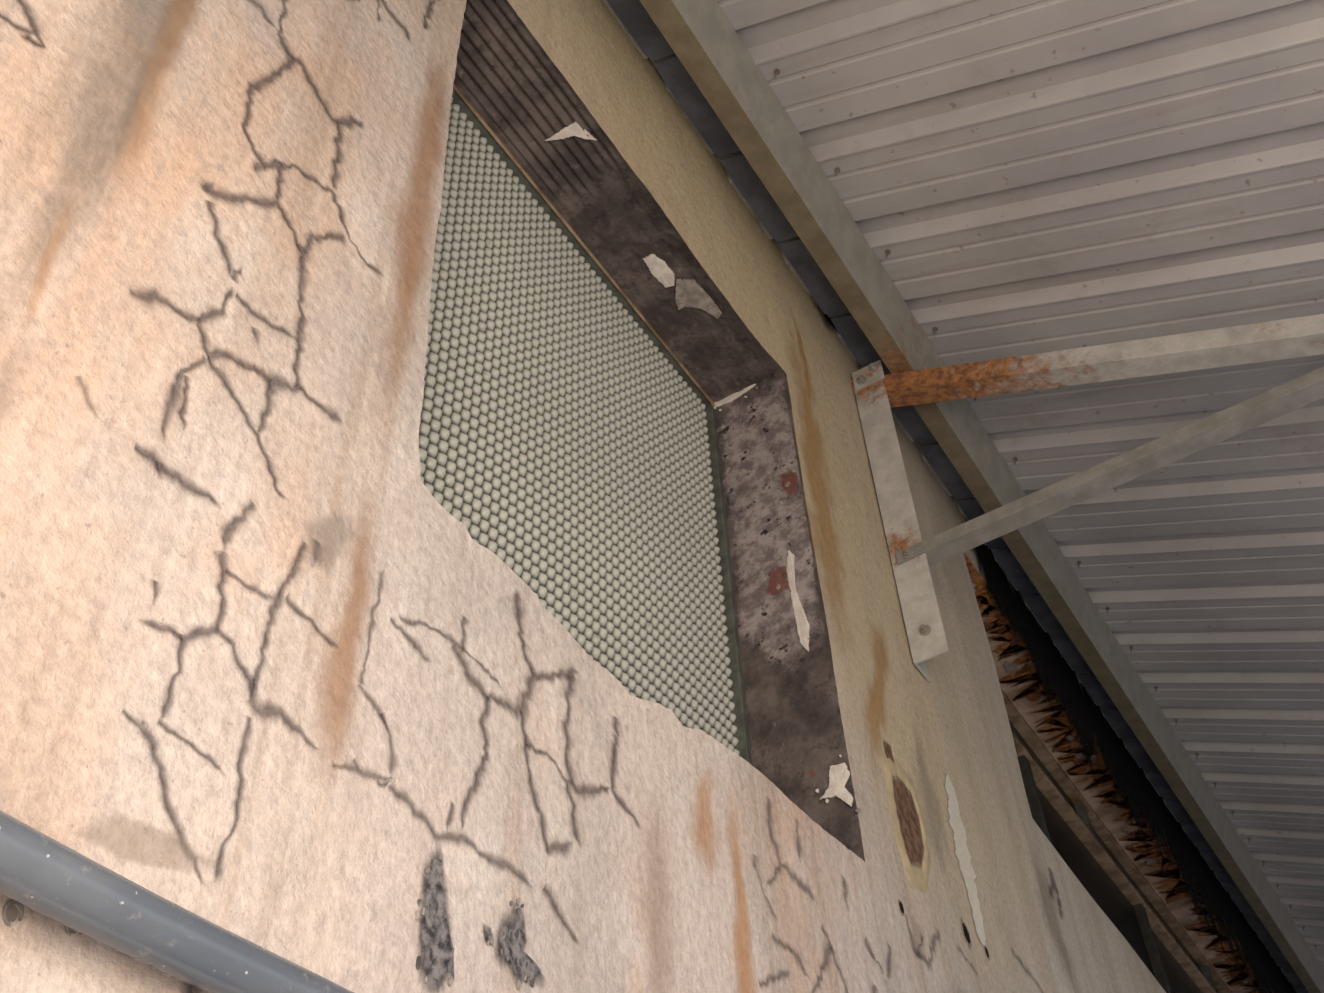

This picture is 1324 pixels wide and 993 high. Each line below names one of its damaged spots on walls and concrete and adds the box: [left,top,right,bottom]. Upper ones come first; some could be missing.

crack [0,0,45,47]
crack [123,0,639,941]
spalling [883,740,931,893]
rust [963,552,1261,993]
crack [187,984,198,993]
rust [735,847,752,993]
crack [755,801,939,993]